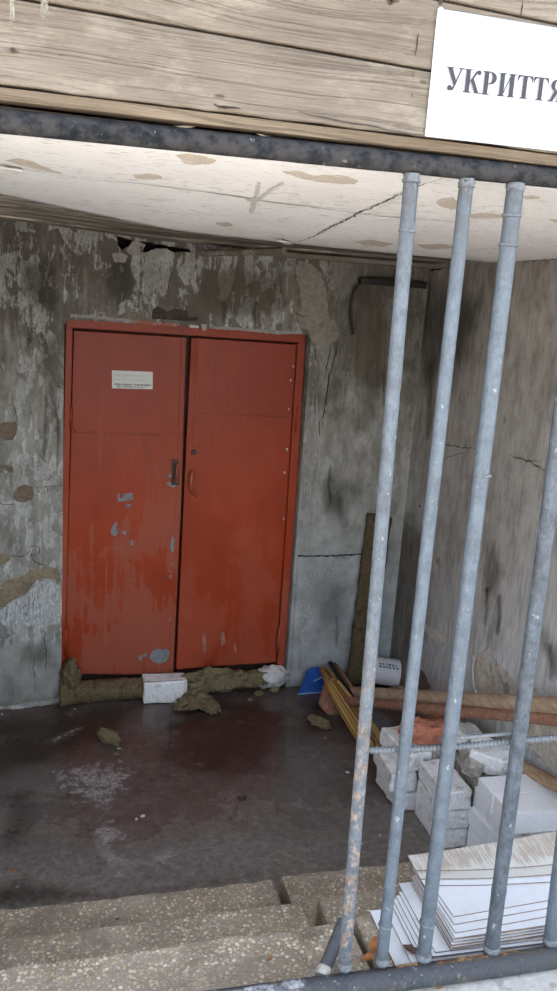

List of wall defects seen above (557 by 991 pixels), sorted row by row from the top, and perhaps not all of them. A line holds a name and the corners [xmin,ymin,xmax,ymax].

crack [0,158,452,245]
spalling [112,236,191,263]
crack [315,337,340,435]
spalling [0,407,18,441]
spalling [11,482,60,503]
peeling [117,493,133,508]
crack [298,552,361,560]
peeling [0,566,63,628]
peeling [139,649,170,663]
spalling [471,647,518,695]
water stain [57,761,129,804]